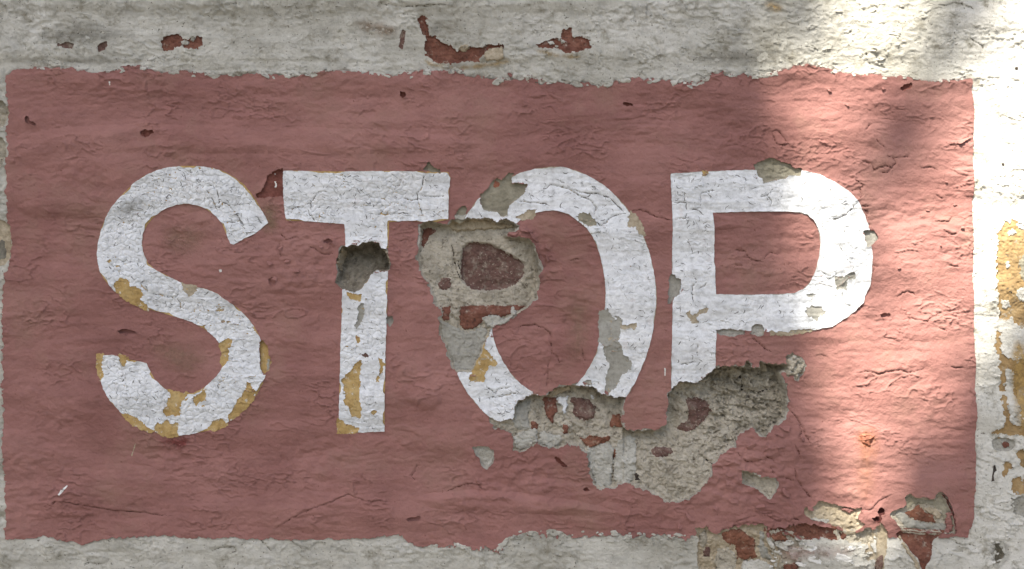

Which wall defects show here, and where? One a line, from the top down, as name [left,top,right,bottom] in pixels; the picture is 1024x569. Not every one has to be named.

flaking render [161,34,203,51]
flaking render [168,1,930,91]
peeling [113,278,149,311]
flaking render [415,173,543,383]
peeling [122,389,206,438]
peeling [218,338,232,367]
peeling [208,382,258,432]
peeling [260,340,272,374]
flaking render [323,238,391,434]
flaking render [489,307,807,503]
peeling [982,219,1024,569]
flaking render [454,492,955,569]